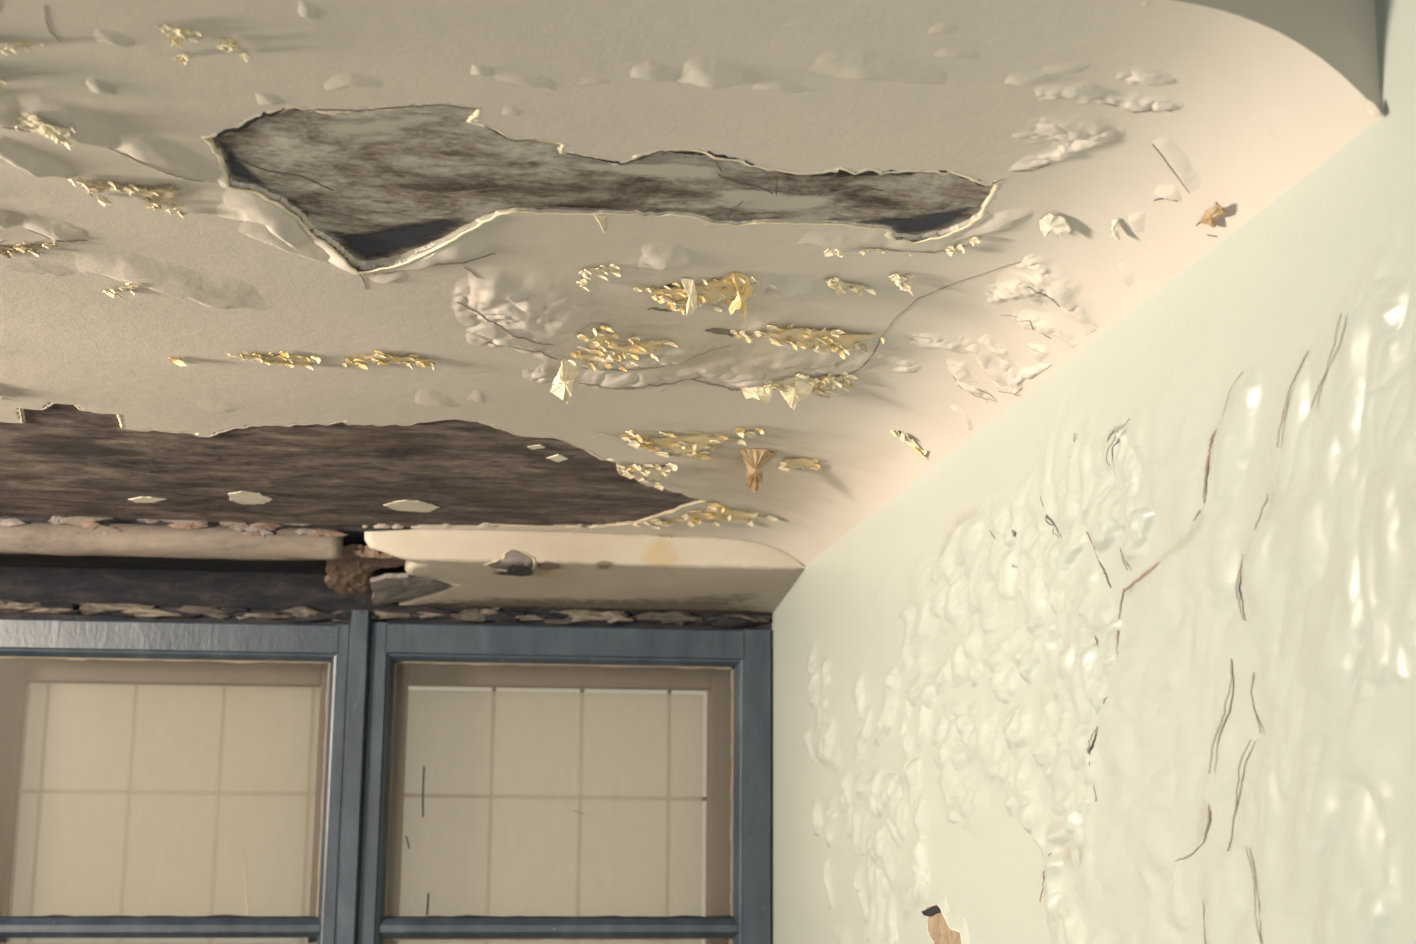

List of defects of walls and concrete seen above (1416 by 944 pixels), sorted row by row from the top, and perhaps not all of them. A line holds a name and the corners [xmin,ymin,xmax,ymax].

peeling [157,24,251,66]
peeling [66,176,188,219]
flaking render [201,103,1003,274]
peeling [889,273,914,296]
peeling [550,325,678,404]
peeling [576,264,884,410]
flaking render [0,403,821,628]